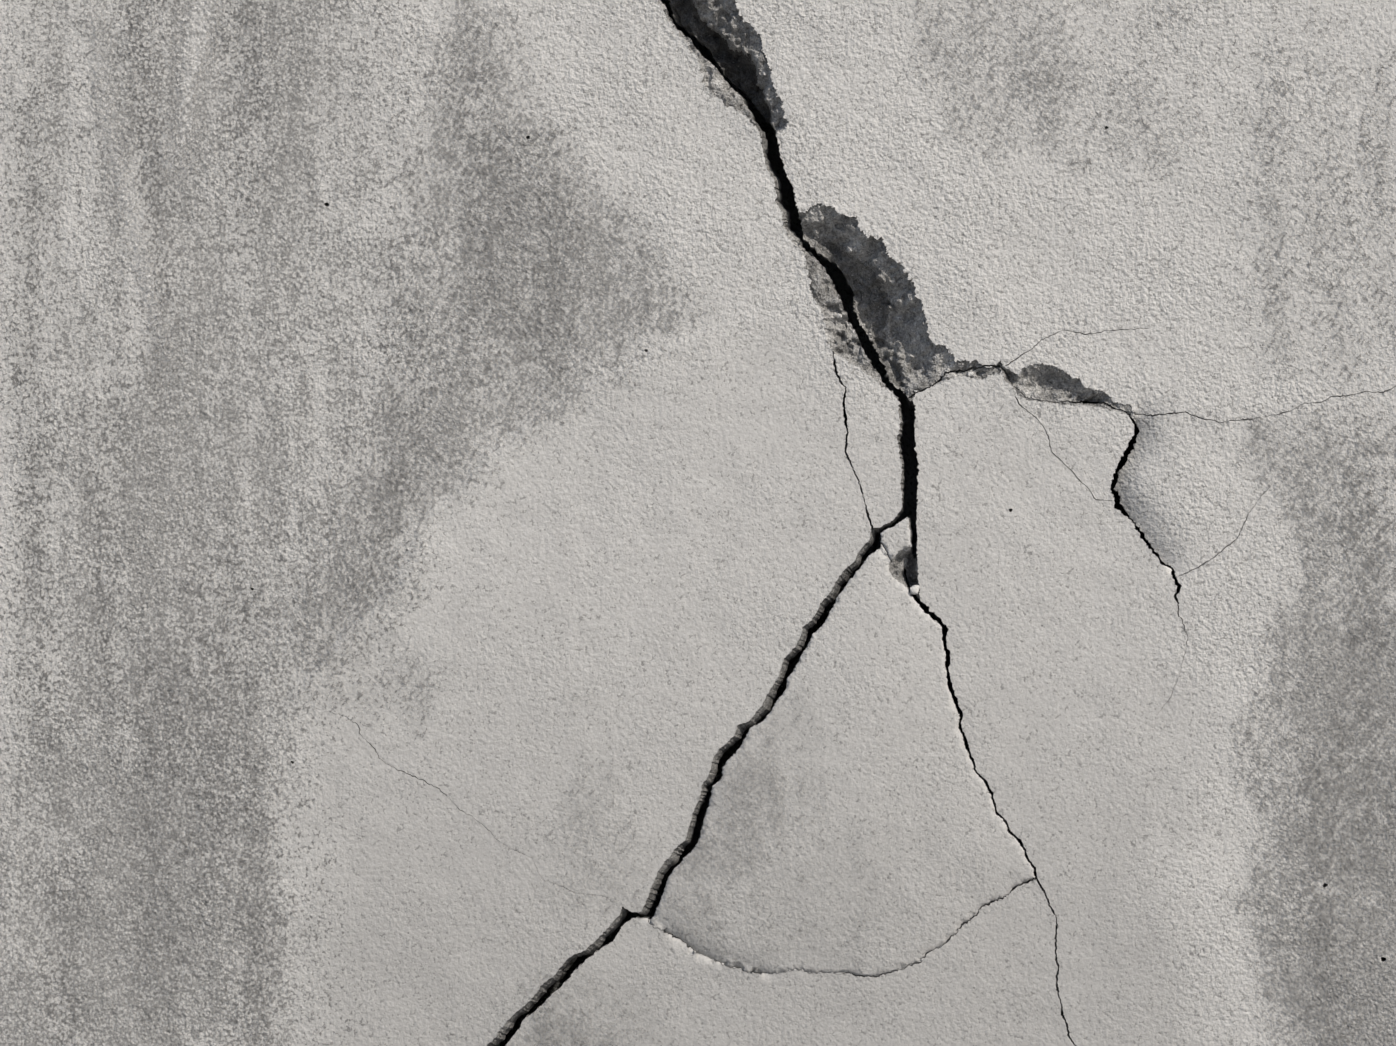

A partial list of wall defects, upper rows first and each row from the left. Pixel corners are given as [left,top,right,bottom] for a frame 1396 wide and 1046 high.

damp [0,0,717,1046]
spalling [657,0,789,134]
crack [329,0,1393,1046]
spalling [782,203,1138,422]
damp [1226,402,1396,1046]
damp [1248,20,1396,381]